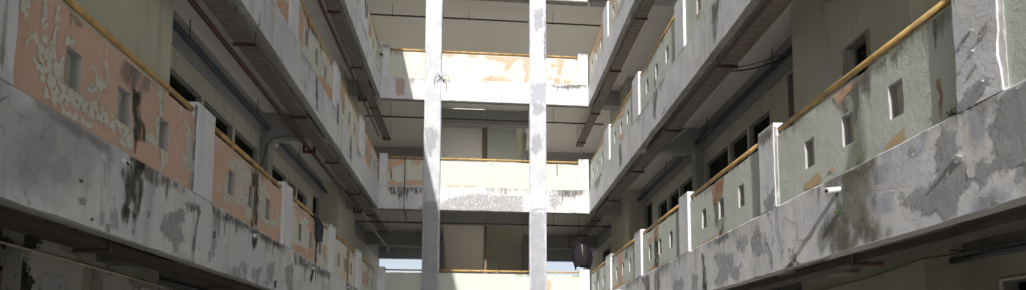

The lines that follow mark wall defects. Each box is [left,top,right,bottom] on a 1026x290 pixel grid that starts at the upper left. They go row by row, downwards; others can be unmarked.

peeling [19,0,169,169]
peeling [445,54,529,83]
flaking render [956,21,994,112]
peeling [885,128,915,156]
flaking render [899,82,1026,220]
damp [388,170,421,197]
flaking render [764,186,775,213]
flaking render [700,225,767,286]
crack [764,209,815,271]